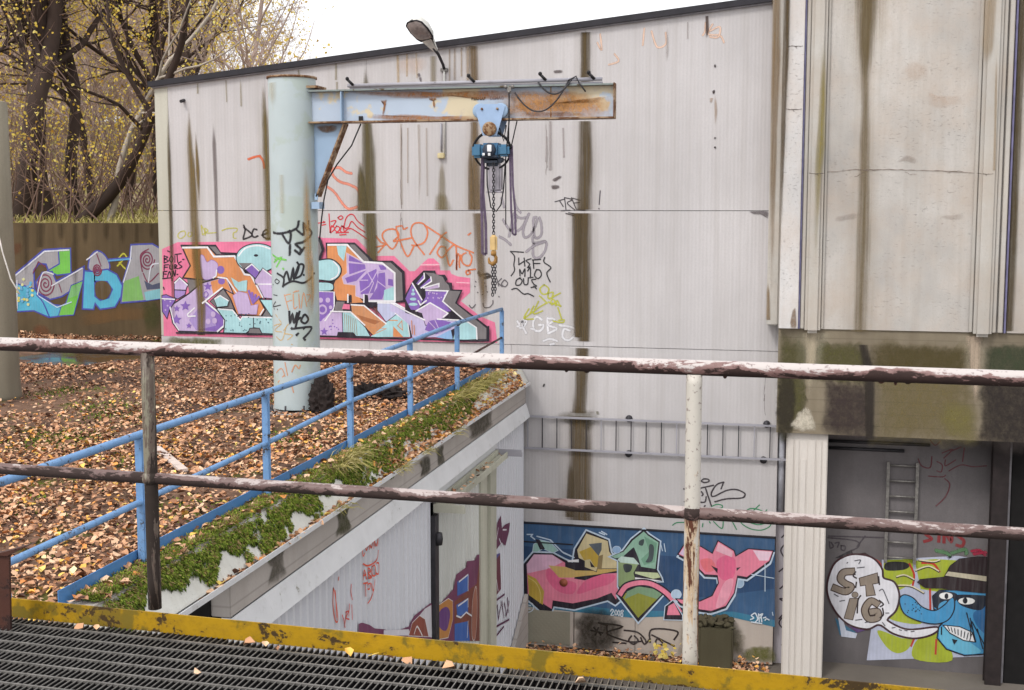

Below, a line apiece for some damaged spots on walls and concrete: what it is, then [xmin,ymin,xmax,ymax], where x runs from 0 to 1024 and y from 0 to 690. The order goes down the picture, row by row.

damp [581,32,590,82]
rust [510,93,600,115]
damp [358,123,377,261]
damp [858,0,872,332]
crack [810,169,993,177]
damp [188,126,205,335]
damp [572,121,591,356]
damp [807,333,819,364]
damp [860,345,872,366]
damp [567,371,598,521]
damp [777,379,874,439]
damp [974,385,1024,451]